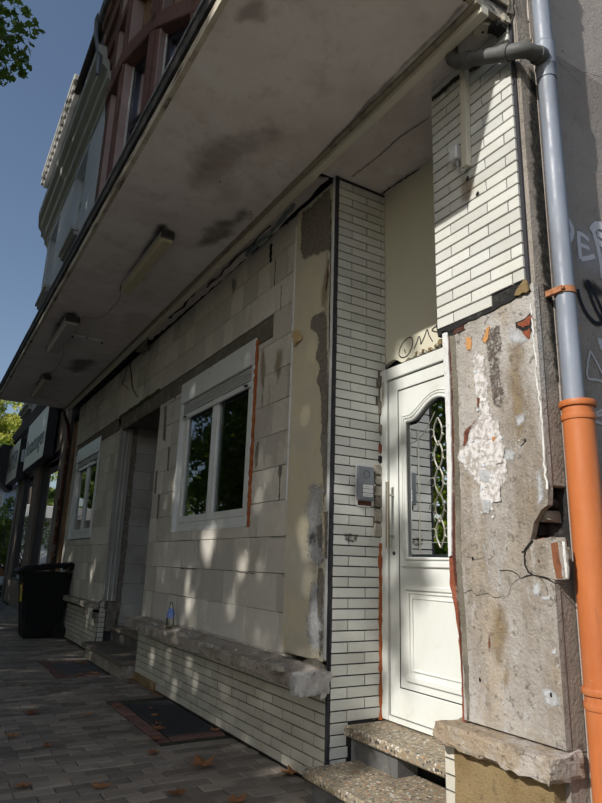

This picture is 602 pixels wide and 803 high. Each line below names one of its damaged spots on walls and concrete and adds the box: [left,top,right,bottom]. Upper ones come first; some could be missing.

peeling [306,311,328,655]
crack [465,540,567,598]
spalling [515,303,571,580]